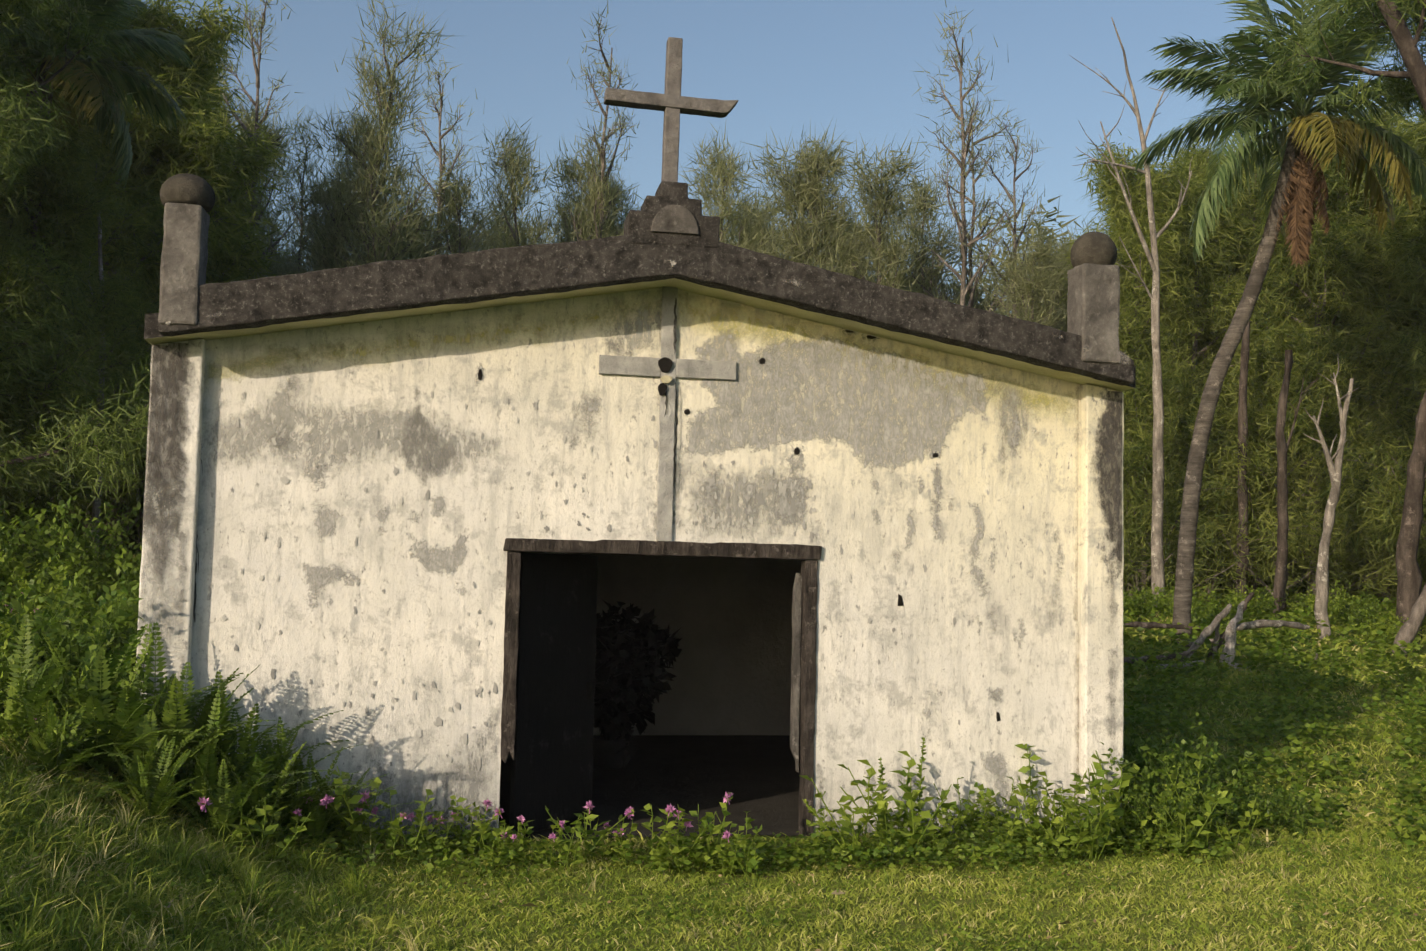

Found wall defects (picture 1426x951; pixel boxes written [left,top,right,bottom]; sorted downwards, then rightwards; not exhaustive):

damp [139,341,192,660]
damp [208,378,494,477]
damp [697,470,806,529]
damp [1092,388,1122,584]